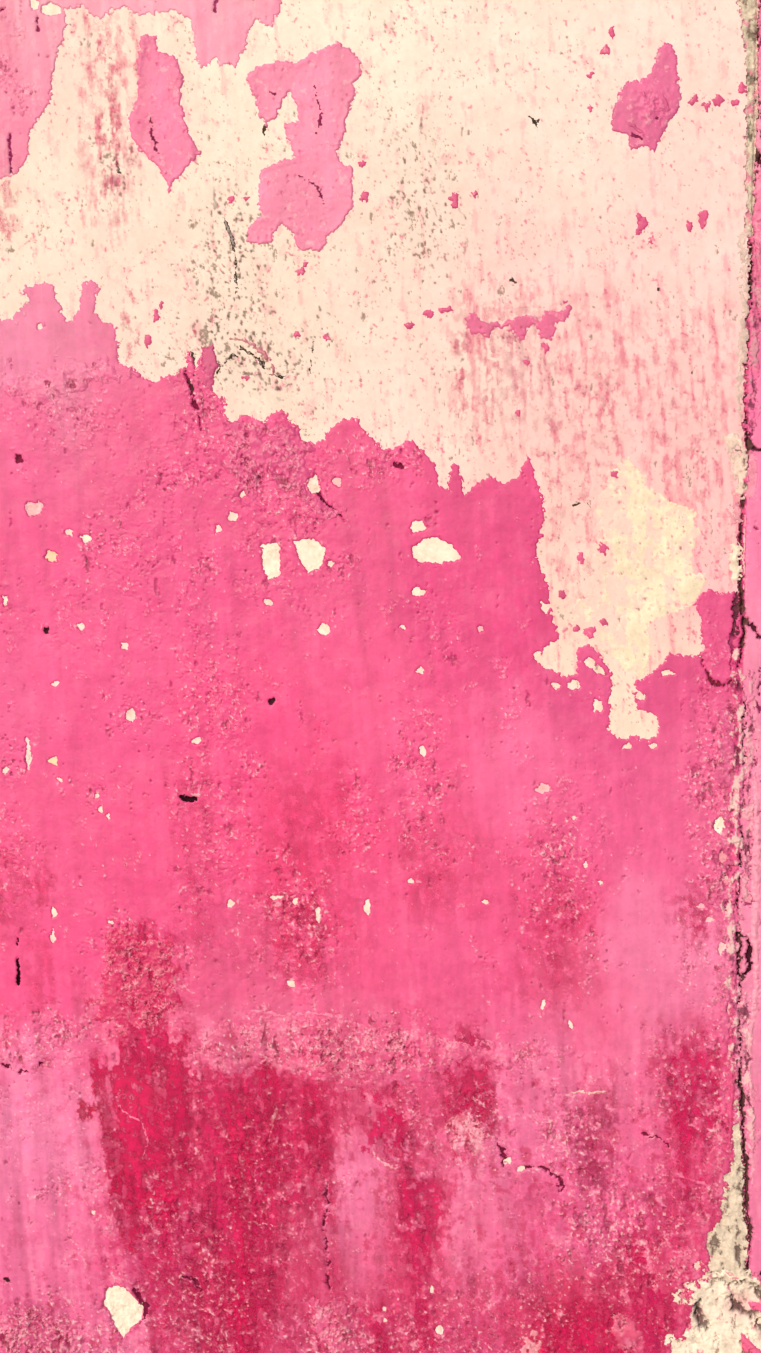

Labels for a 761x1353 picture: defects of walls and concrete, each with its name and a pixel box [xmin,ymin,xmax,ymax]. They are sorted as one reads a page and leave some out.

peeling [0,0,749,749]
crack [689,0,761,1284]
crack [641,1132,670,1148]
peeling [104,1286,144,1338]
spalling [660,1260,761,1353]